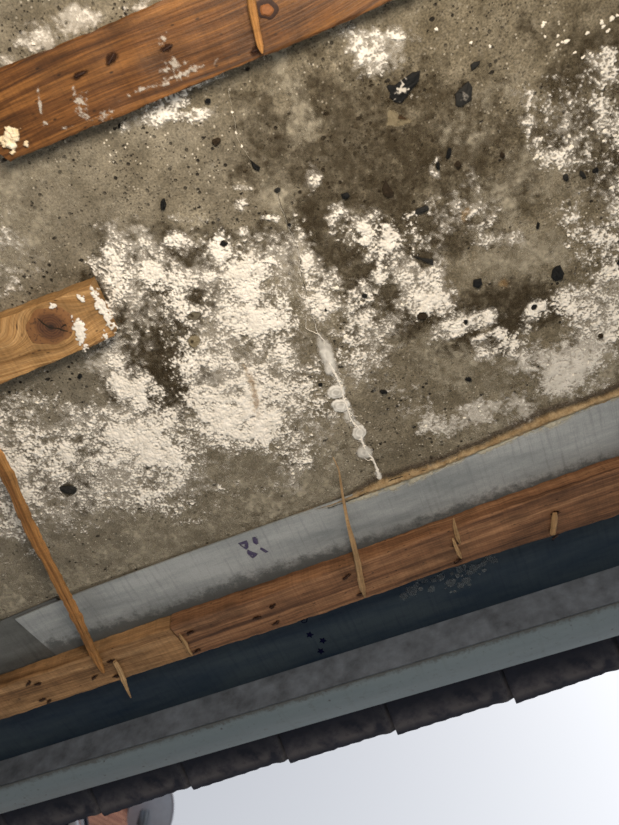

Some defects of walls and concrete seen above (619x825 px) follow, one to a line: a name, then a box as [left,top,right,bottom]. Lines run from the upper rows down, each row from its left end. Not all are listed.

leakage [15,5,101,51]
leakage [0,14,619,591]
crack [279,199,425,482]